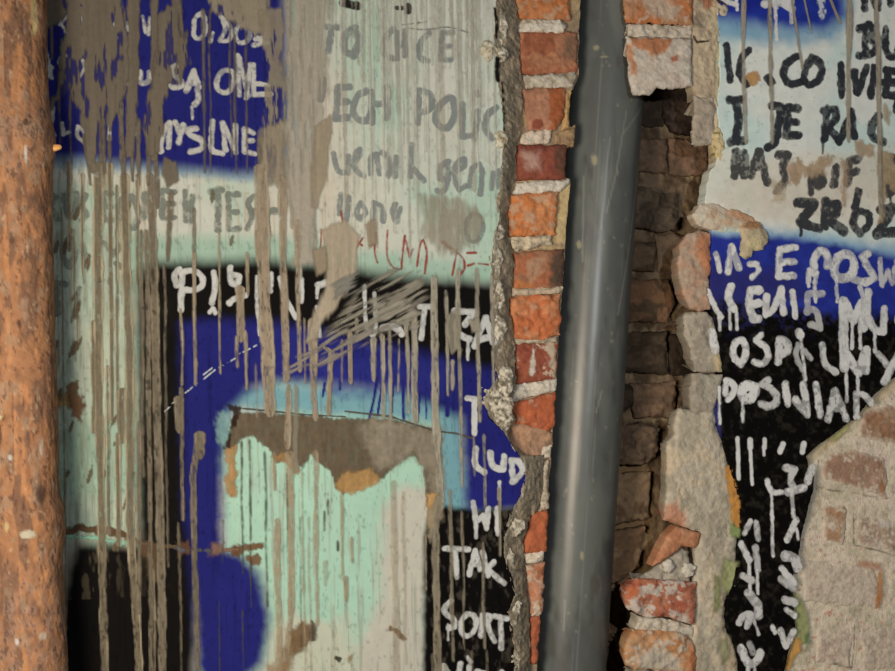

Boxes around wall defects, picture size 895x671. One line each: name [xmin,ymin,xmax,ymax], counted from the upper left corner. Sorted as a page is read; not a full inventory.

spalling [684,0,728,165]
damp [773,155,848,206]
damp [855,140,895,223]
spalling [481,0,581,671]
peeling [218,405,445,539]
spalling [654,230,740,671]
spalling [785,378,895,671]